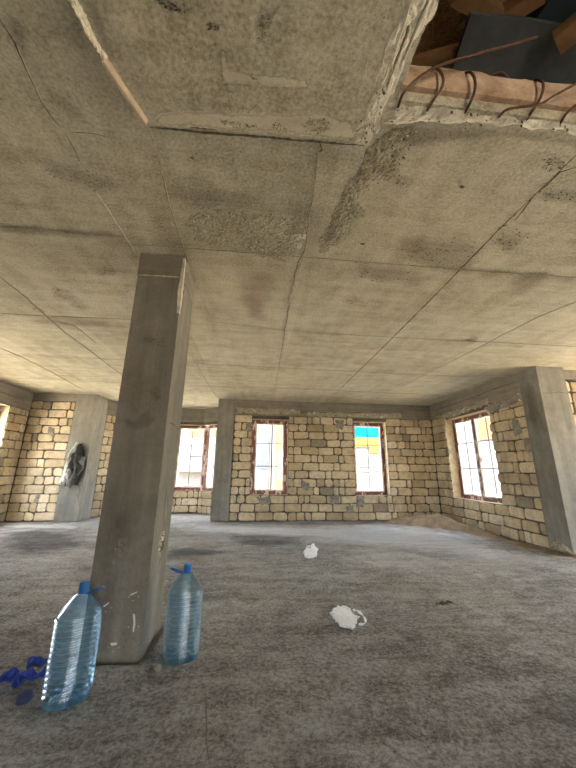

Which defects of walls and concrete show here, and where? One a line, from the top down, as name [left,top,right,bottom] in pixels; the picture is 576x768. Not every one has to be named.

crack [0,20,108,165]
spalling [353,0,576,184]
crack [0,277,122,376]
spalling [177,258,187,314]
crack [149,127,364,390]
crack [337,155,576,393]